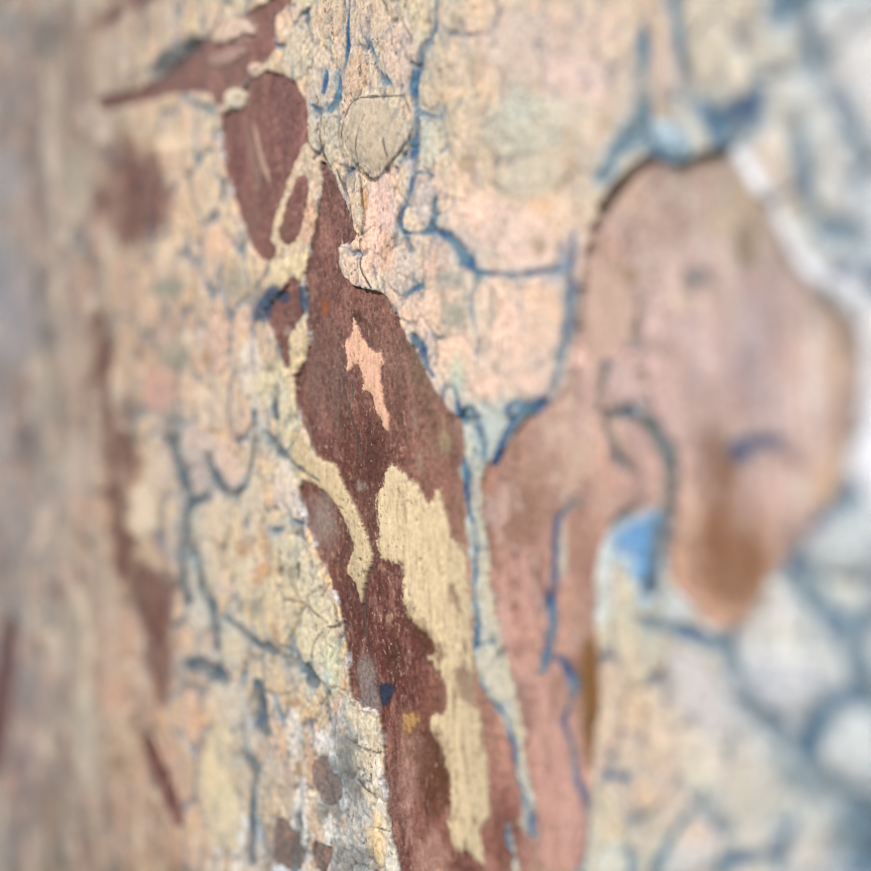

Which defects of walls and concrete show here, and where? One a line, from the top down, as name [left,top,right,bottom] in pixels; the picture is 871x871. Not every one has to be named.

peeling [100,0,309,261]
crack [308,0,577,522]
crack [596,22,687,183]
crack [669,0,764,154]
crack [244,752,260,865]
crack [253,678,270,736]
crack [164,396,369,694]
crack [473,545,496,649]
crack [537,504,587,808]
peeling [261,150,871,871]
crack [596,360,680,595]
crack [740,479,871,871]